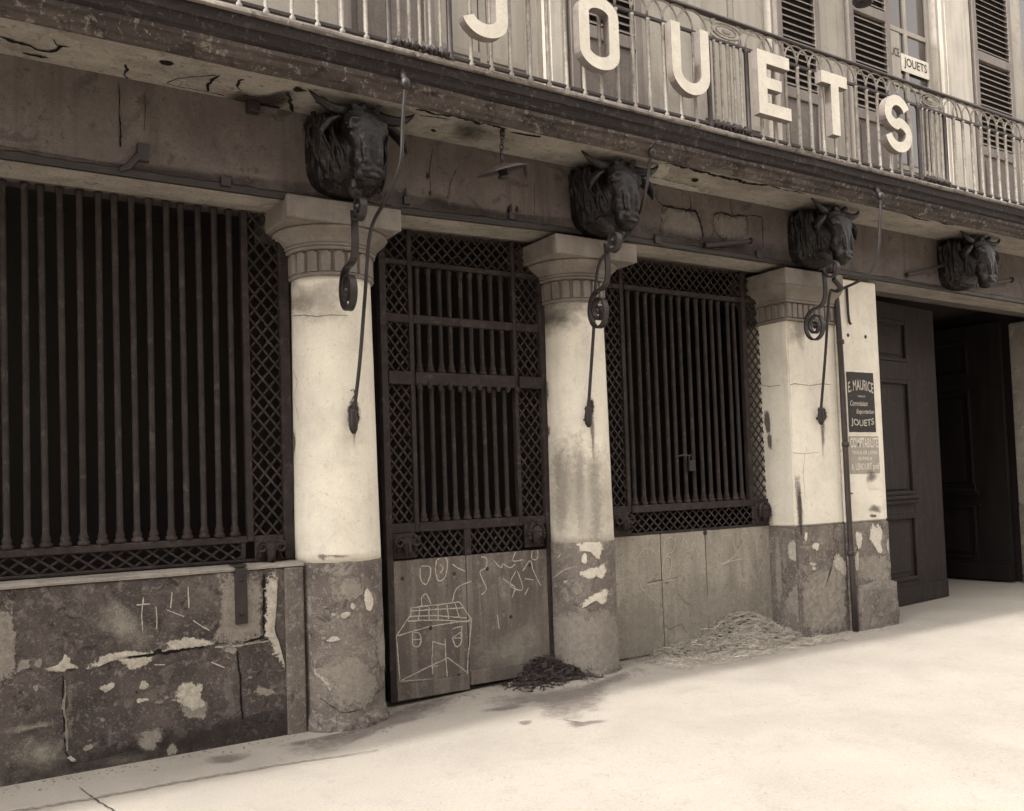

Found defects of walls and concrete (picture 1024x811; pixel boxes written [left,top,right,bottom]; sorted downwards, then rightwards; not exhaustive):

crack [0,36,66,58]
crack [118,64,244,147]
crack [285,92,294,112]
peeling [0,603,79,692]
crack [61,637,269,762]
spalling [137,680,207,720]
peeling [212,569,286,669]
spalling [248,676,276,696]
spalling [331,577,374,619]
spalling [553,541,619,672]
spalling [775,506,891,637]